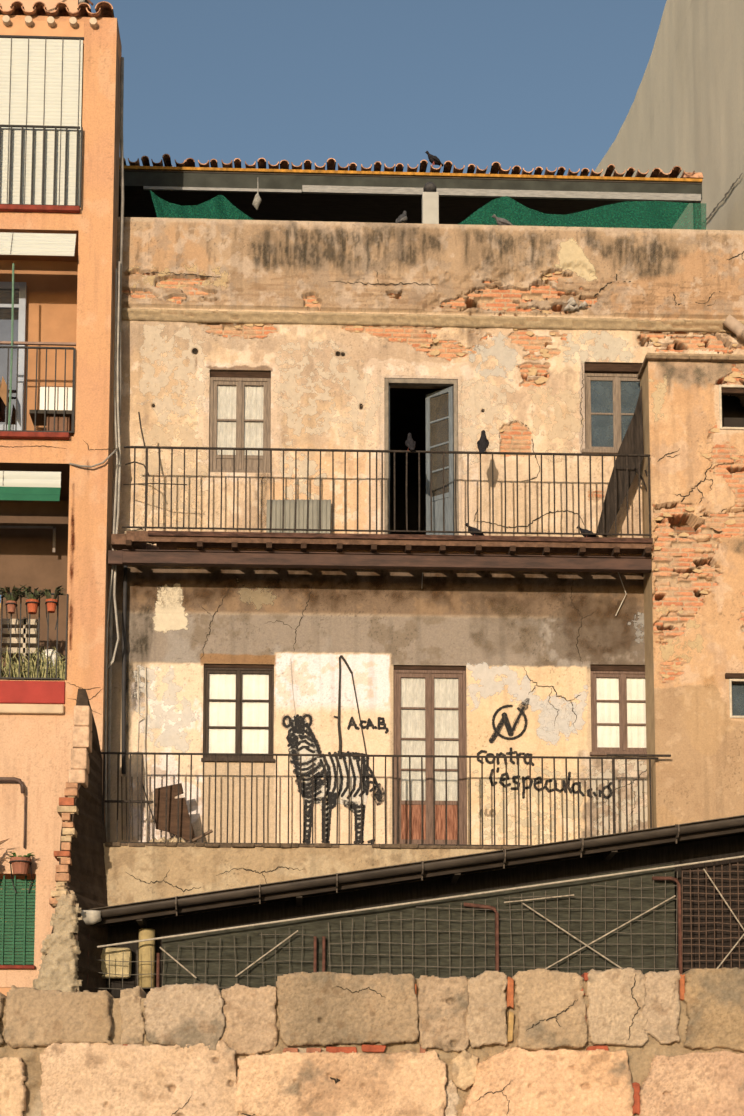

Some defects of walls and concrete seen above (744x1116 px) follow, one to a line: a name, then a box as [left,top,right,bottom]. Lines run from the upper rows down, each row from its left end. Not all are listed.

leakage [253,228,391,266]
leakage [406,235,439,263]
leakage [589,241,678,274]
flaking render [342,238,744,474]
peeling [137,323,278,531]
peeling [273,339,384,500]
flaking render [628,425,744,682]
peeling [153,583,188,633]
crack [200,584,233,659]
peeling [466,662,588,745]
crack [524,668,580,726]
crack [628,974,641,1040]